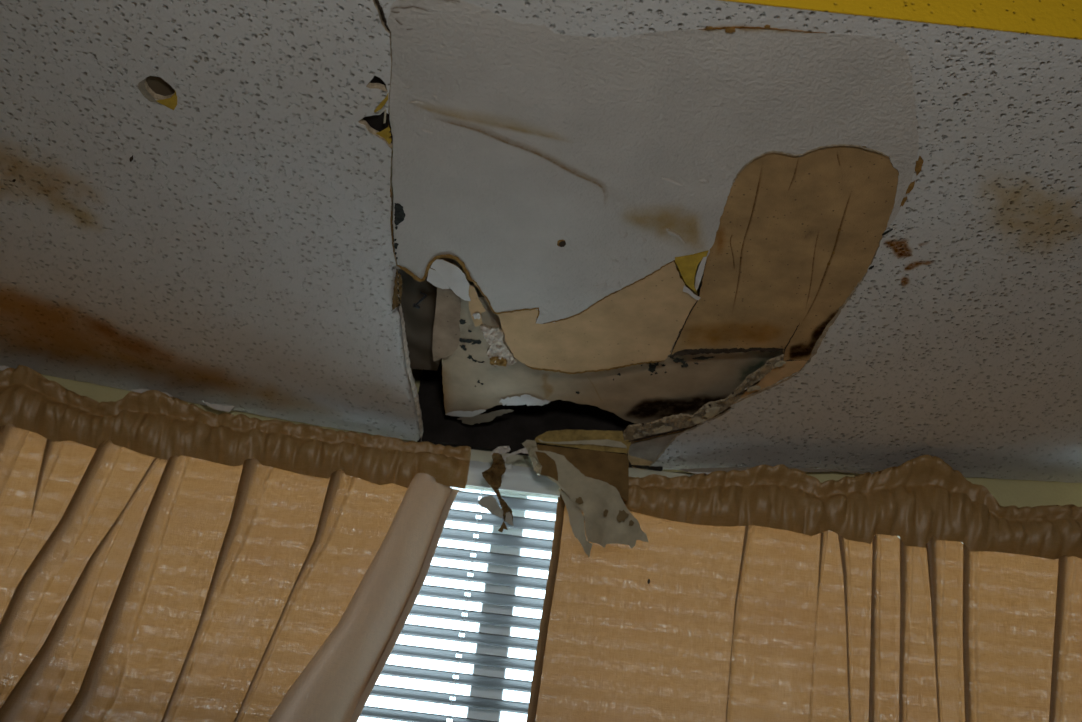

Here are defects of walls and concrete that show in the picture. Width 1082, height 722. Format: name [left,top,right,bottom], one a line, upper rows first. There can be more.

crack [375,0,426,32]
hole [138,76,177,110]
crack [388,186,396,254]
peeling [359,0,924,404]
water stain [790,313,835,358]
peeling [628,406,720,470]